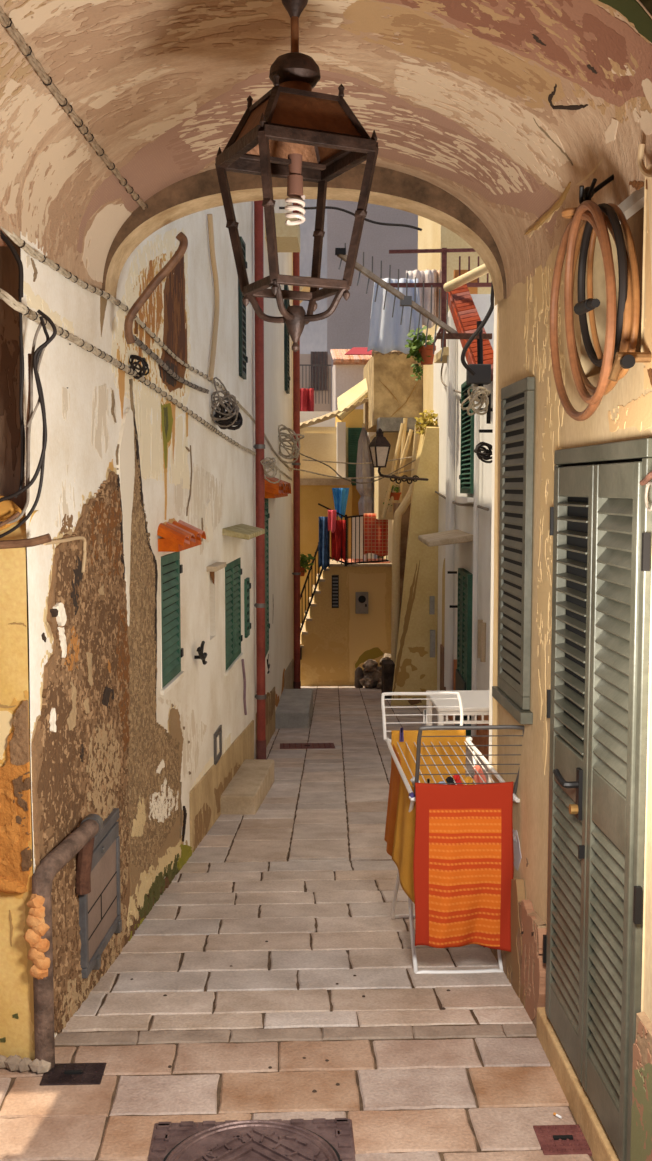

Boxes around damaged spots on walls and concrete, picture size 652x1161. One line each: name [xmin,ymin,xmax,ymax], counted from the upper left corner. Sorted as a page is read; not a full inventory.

spalling [307,0,652,144]
peeling [0,387,191,1035]